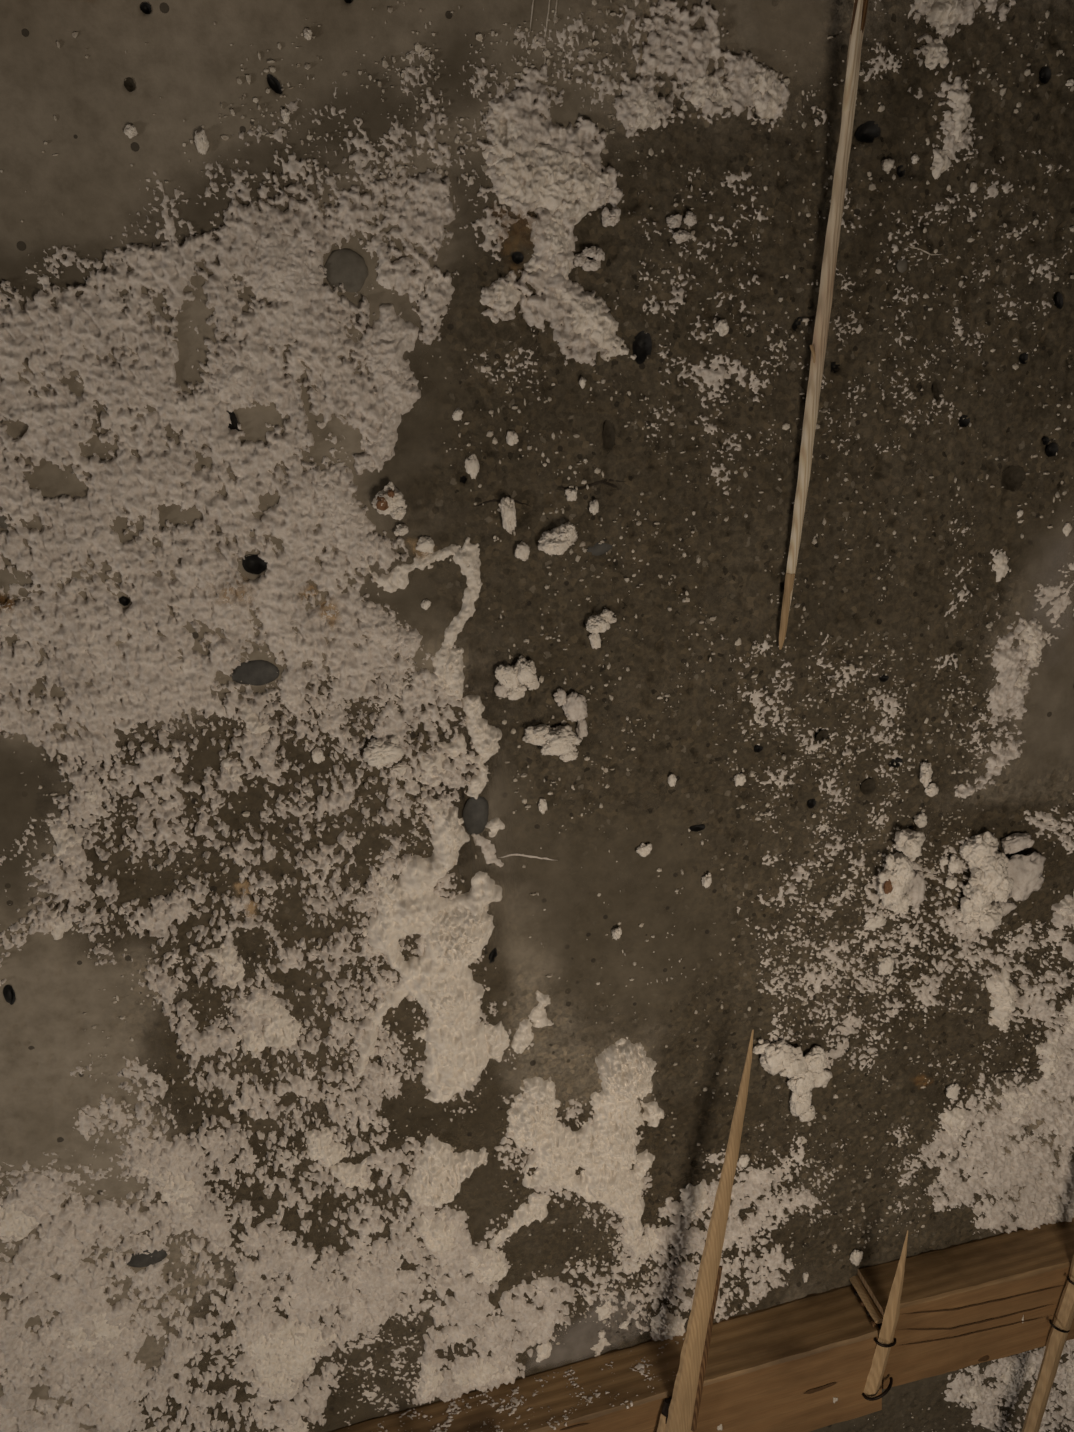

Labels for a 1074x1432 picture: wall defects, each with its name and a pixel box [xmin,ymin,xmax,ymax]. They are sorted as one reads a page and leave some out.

spalling [140,2,152,14]
peeling [842,0,881,143]
spalling [267,74,283,94]
spalling [633,331,652,364]
peeling [515,541,530,561]
peeling [494,683,510,698]
peeling [553,688,588,740]
peeling [914,812,927,828]
peeling [945,855,961,889]
peeling [906,872,926,908]
spalling [3,985,15,1005]
peeling [813,1069,833,1088]